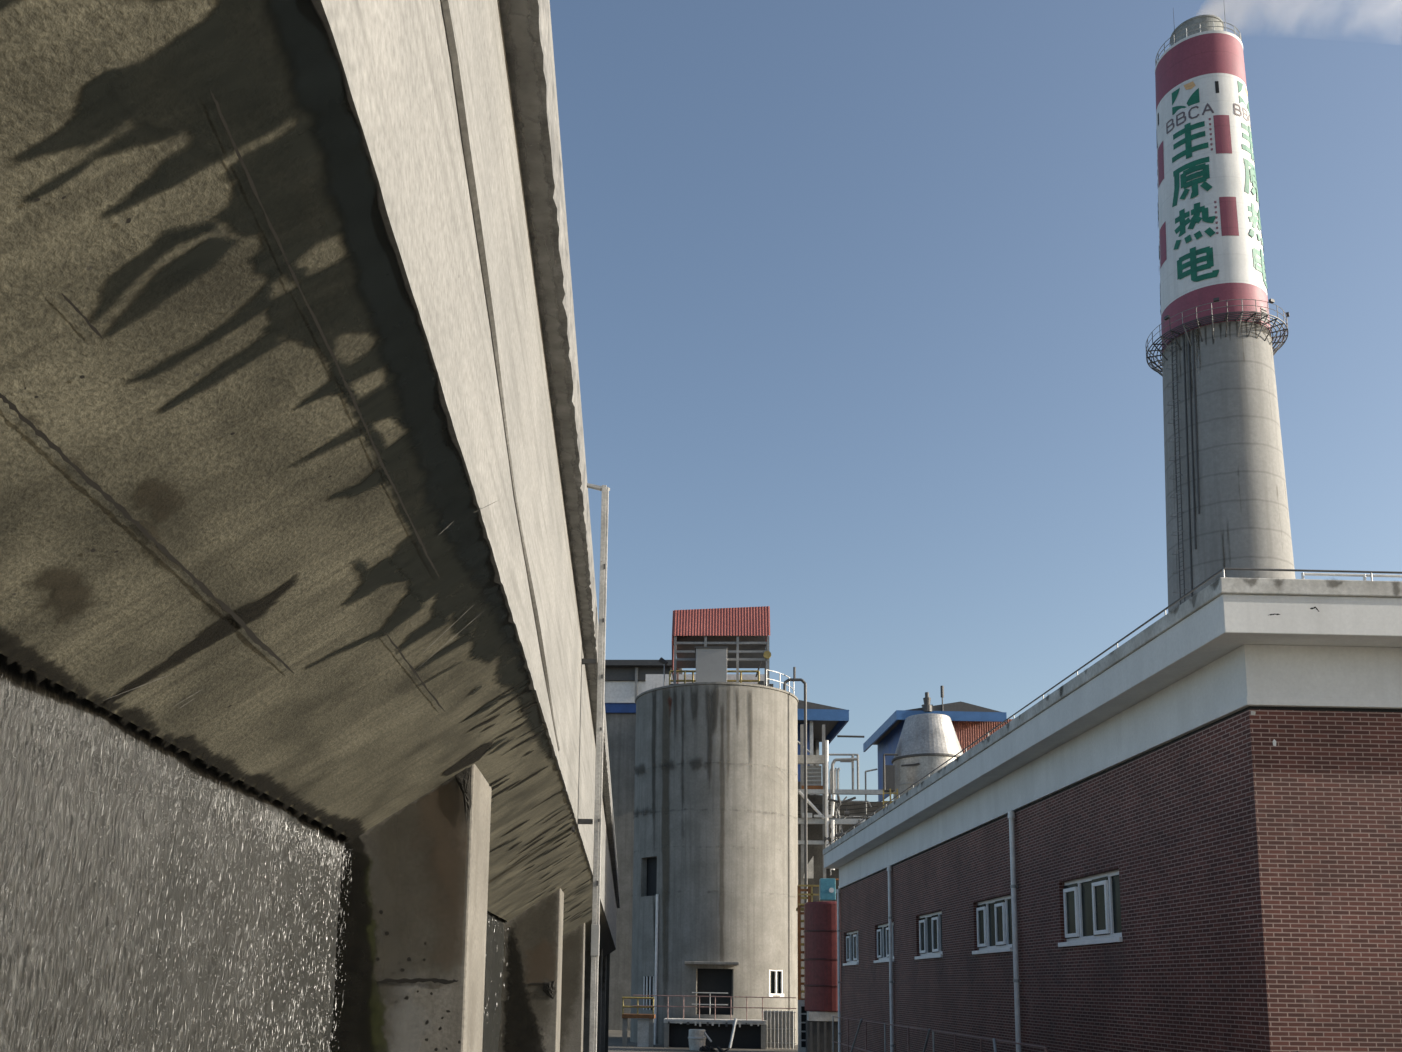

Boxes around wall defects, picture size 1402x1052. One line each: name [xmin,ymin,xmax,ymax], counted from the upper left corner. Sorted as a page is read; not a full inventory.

crack [61,293,103,339]
crack [0,393,294,673]
damp [0,0,554,1052]
damp [489,791,605,1043]
damp [635,690,752,984]